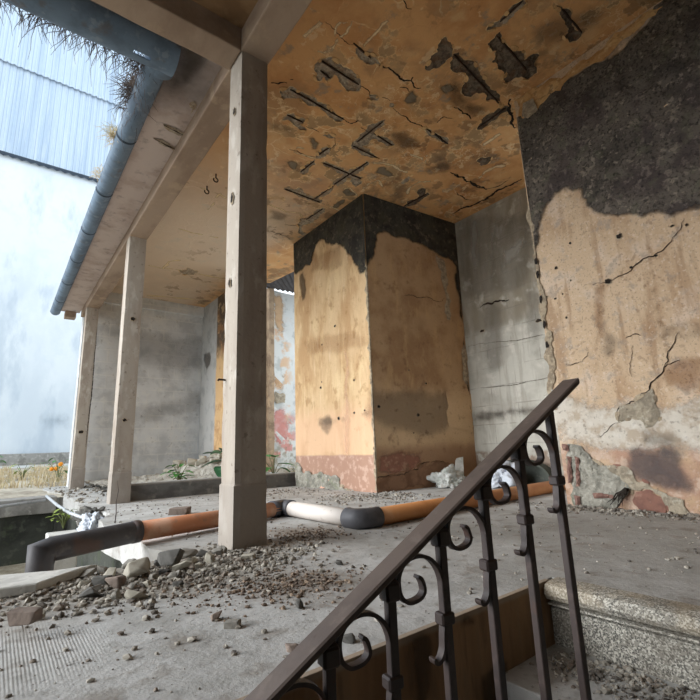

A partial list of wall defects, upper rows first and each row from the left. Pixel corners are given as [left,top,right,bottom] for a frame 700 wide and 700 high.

spalling [279,86,344,123]
spalling [313,22,361,92]
crack [361,65,471,143]
spalling [425,36,508,131]
peeling [486,0,662,118]
spalling [280,112,431,235]
crack [593,220,684,285]
peeling [274,377,288,443]
flaking render [562,444,689,515]
water stain [554,395,700,489]
flaking render [615,388,662,428]
crack [600,333,679,437]